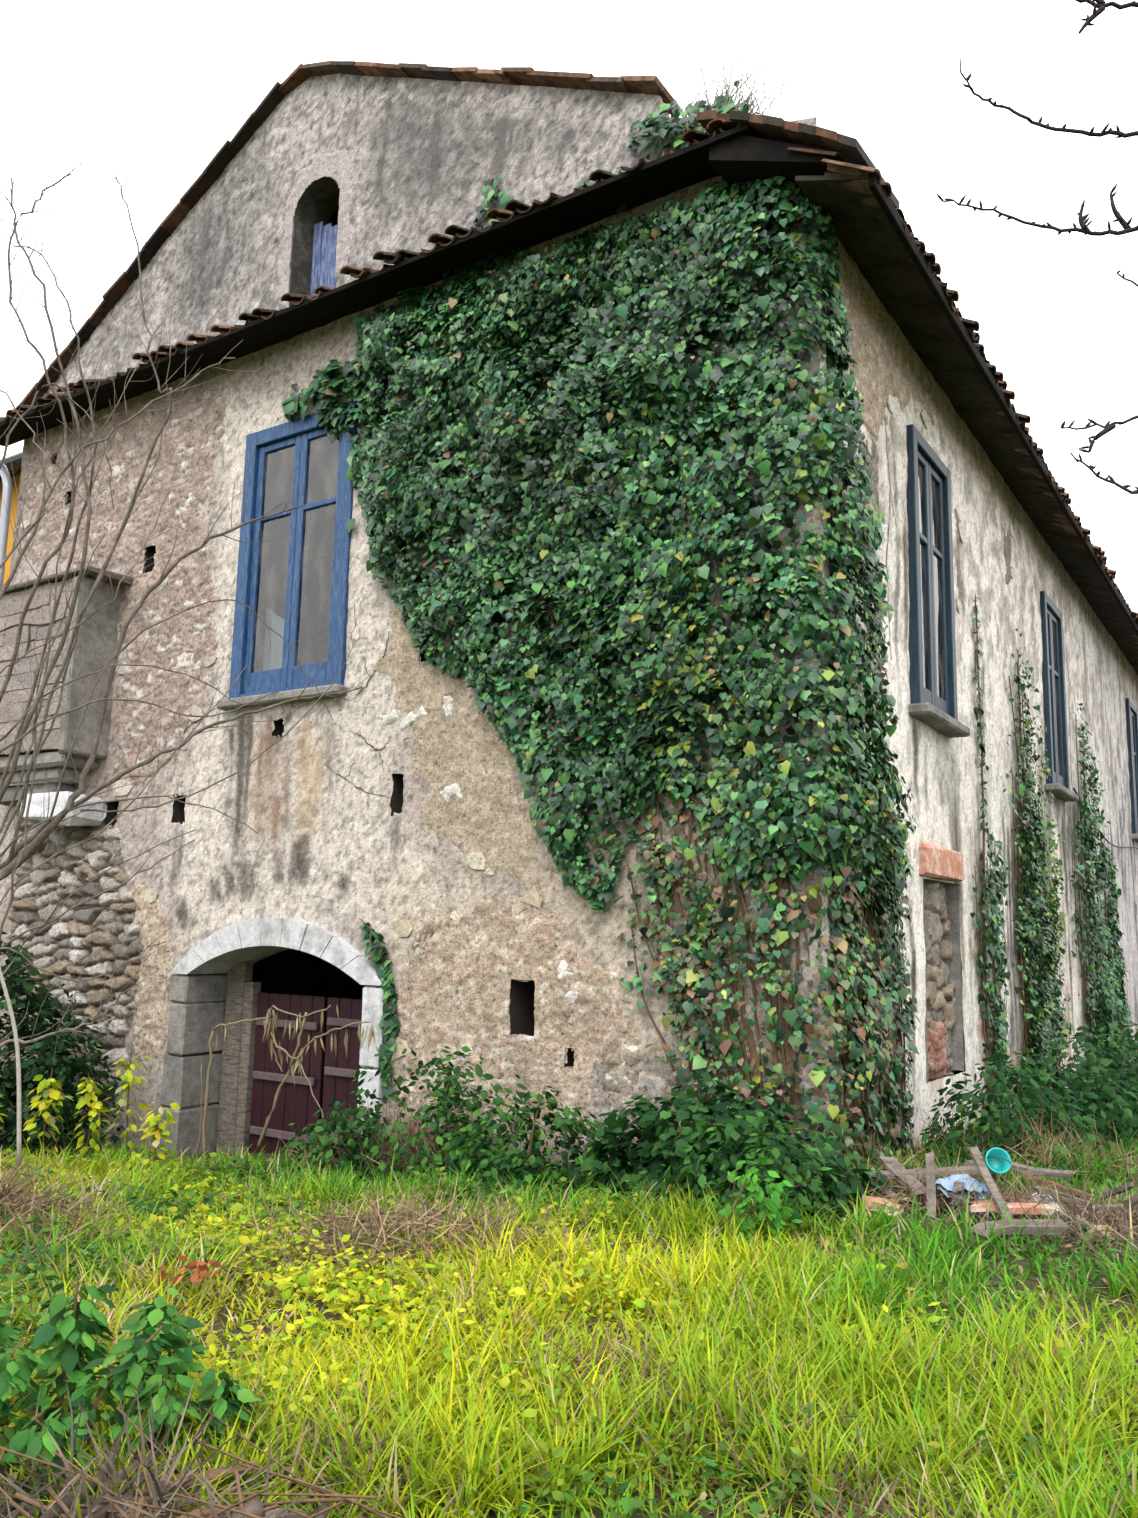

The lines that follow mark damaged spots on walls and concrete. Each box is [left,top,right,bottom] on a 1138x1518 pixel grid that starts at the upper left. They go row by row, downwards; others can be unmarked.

leakage [229,718,252,842]
flaking render [923,881,957,1082]
peeling [975,970,1012,1122]